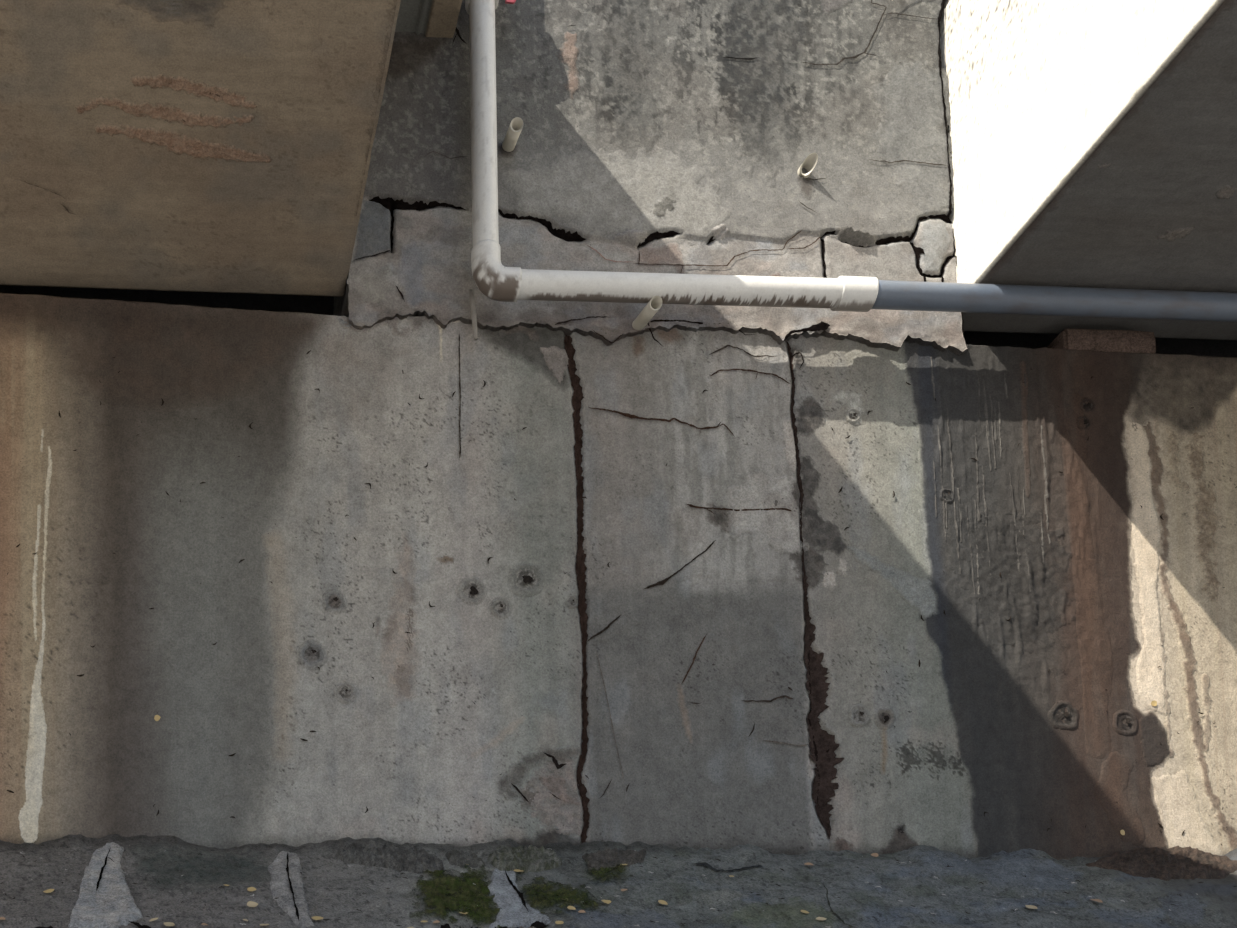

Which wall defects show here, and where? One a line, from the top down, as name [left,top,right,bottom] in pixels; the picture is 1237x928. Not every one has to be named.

leakage [114,0,235,31]
crack [498,0,958,282]
crack [355,196,466,260]
peeling [833,226,877,248]
leakage [0,293,593,849]
crack [511,316,844,843]
leakage [889,341,1237,924]
spalling [494,744,588,837]
crack [96,847,114,891]
crack [129,920,151,928]
crack [286,853,299,920]
crack [440,870,548,928]